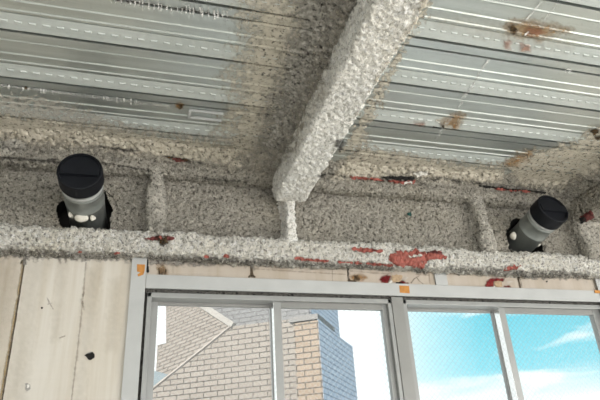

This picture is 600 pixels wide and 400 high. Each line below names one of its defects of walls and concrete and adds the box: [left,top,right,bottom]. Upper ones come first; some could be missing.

rust [509,22,569,38]
rust [433,114,463,129]
spalling [350,171,428,185]
spalling [579,210,594,224]
spalling [144,235,175,246]
spalling [337,247,447,284]